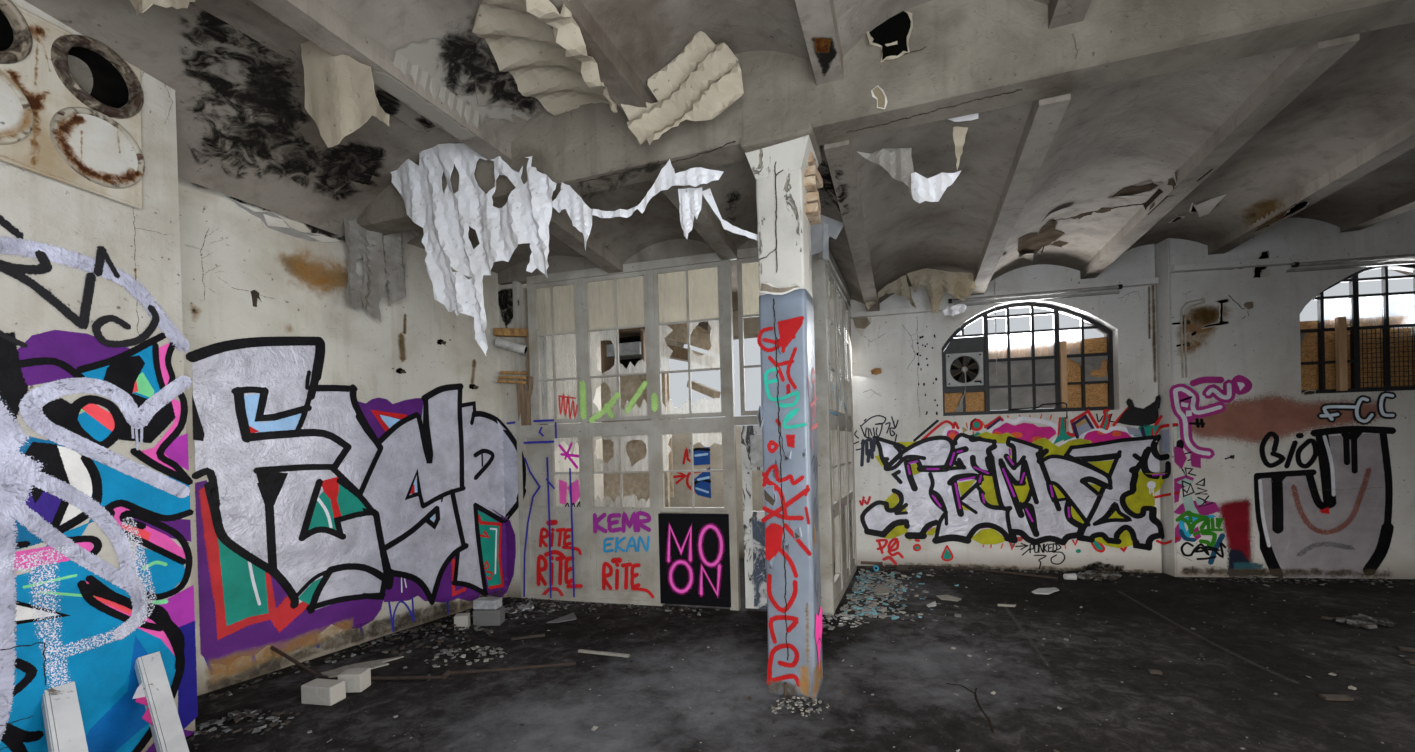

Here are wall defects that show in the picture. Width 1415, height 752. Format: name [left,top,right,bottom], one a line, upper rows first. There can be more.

corrosion [0,26,49,165]
leakage [182,3,385,200]
corrosion [58,113,142,184]
leakage [306,224,345,242]
peeling [227,0,758,357]
flaking render [803,153,823,225]
peeling [856,113,978,203]
peeling [1043,208,1073,221]
peeling [852,268,976,337]